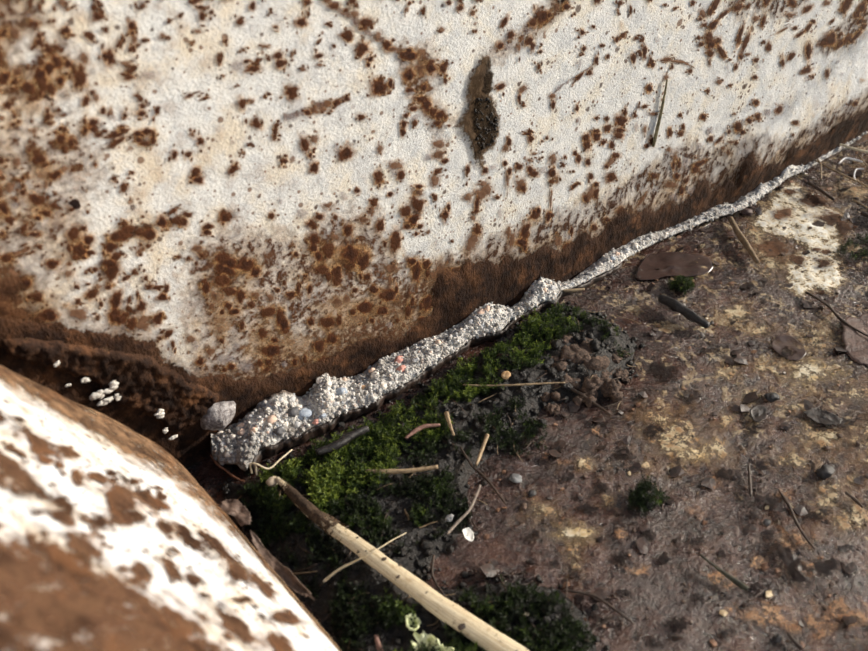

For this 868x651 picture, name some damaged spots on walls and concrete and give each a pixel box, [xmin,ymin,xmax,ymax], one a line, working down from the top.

corrosion [84,0,150,81]
corrosion [314,0,457,138]
corrosion [495,0,576,73]
corrosion [228,98,282,175]
corrosion [573,102,629,183]
leakage [642,423,663,440]
leakage [715,468,733,479]
corrosion [0,411,304,651]
leakage [748,578,777,596]
leakage [804,508,839,524]
leakage [812,544,860,577]
leakage [663,616,687,634]